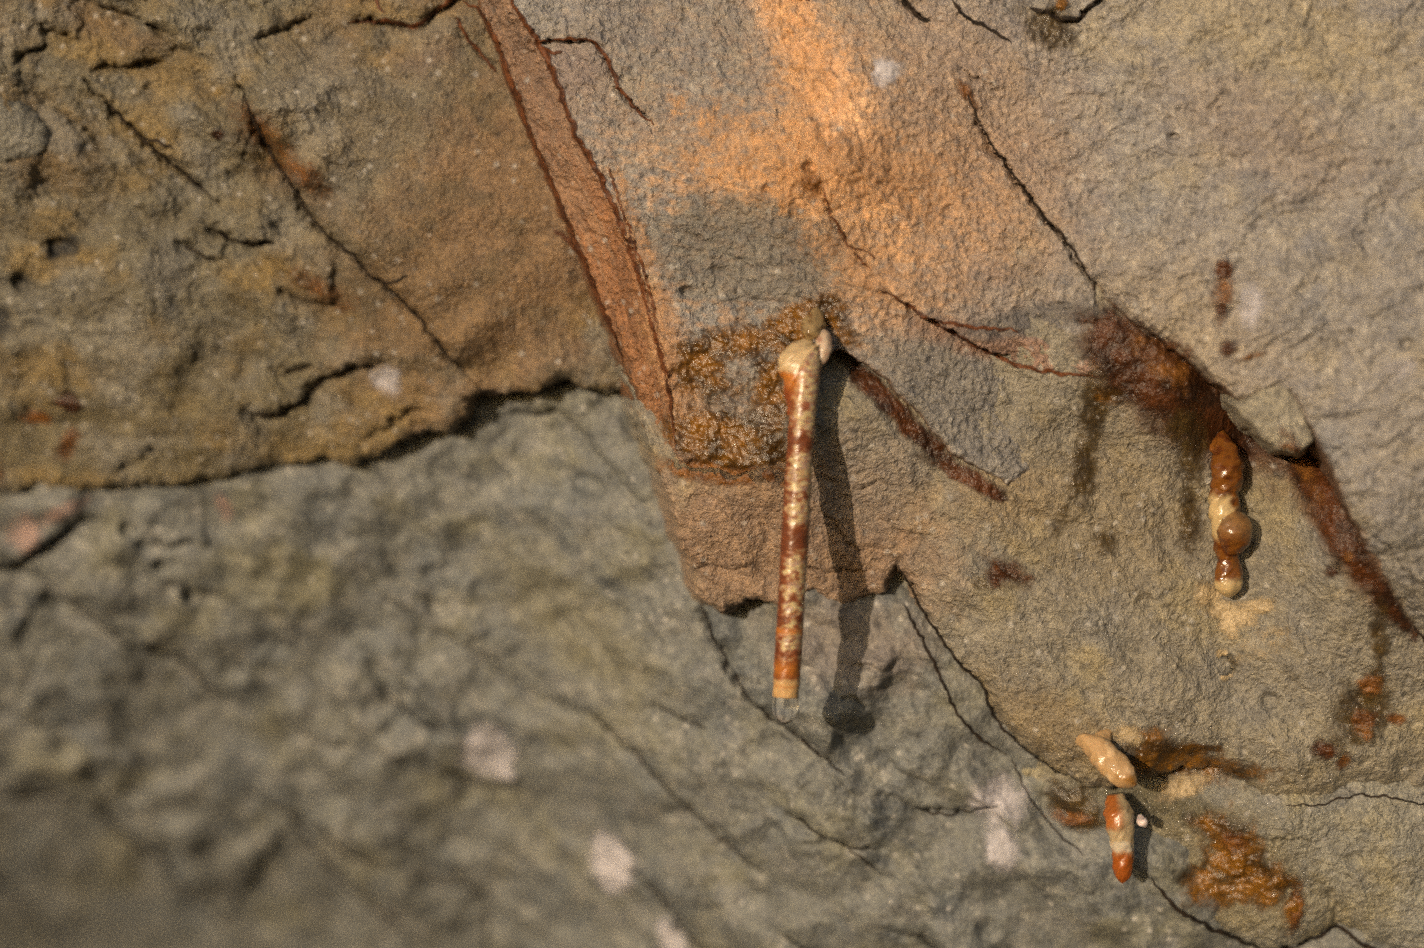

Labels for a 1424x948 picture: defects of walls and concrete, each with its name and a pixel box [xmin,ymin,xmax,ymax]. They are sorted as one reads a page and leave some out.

crack [966,93,1095,288]
crack [822,187,1099,378]
crack [244,364,374,417]
damp [1058,381,1122,522]
damp [1166,409,1207,550]
damp [1195,583,1274,657]
damp [1116,725,1259,800]